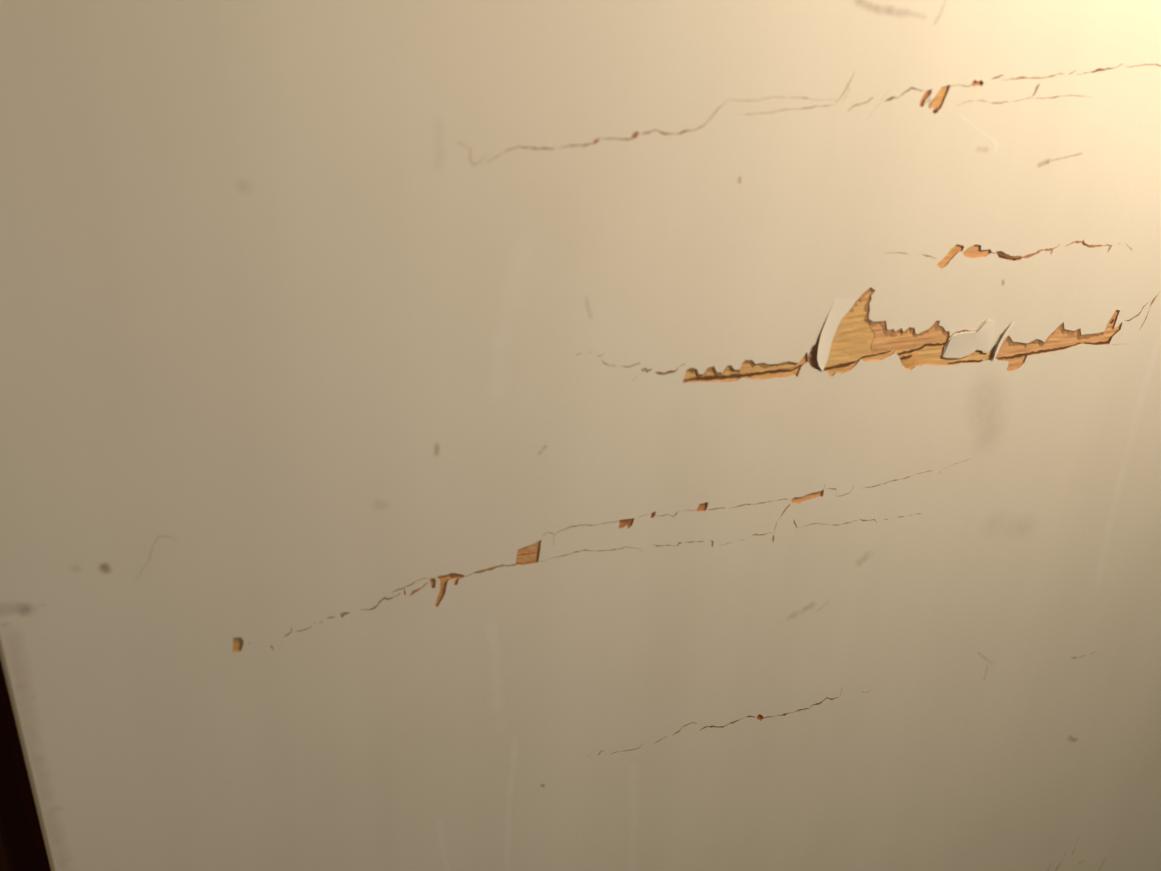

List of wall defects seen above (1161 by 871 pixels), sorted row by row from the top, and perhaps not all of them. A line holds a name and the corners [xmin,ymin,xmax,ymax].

crack [450,64,1161,165]
peeling [577,287,1159,382]
crack [586,690,871,757]